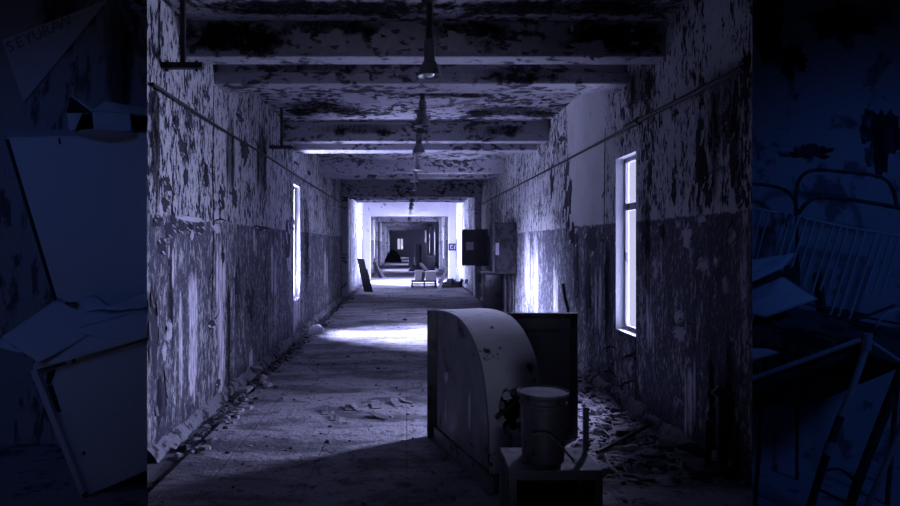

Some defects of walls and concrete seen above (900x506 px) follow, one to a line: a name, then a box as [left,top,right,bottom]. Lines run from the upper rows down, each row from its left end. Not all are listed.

peeling [290,26,352,54]
peeling [365,26,424,58]
peeling [437,21,543,57]
peeling [563,24,614,61]
peeling [152,175,220,255]
peeling [173,89,210,190]
peeling [203,162,238,211]
peeling [240,134,252,167]
peeling [548,154,597,327]
peeling [680,113,712,248]
peeling [234,256,257,324]
peeling [147,278,176,428]